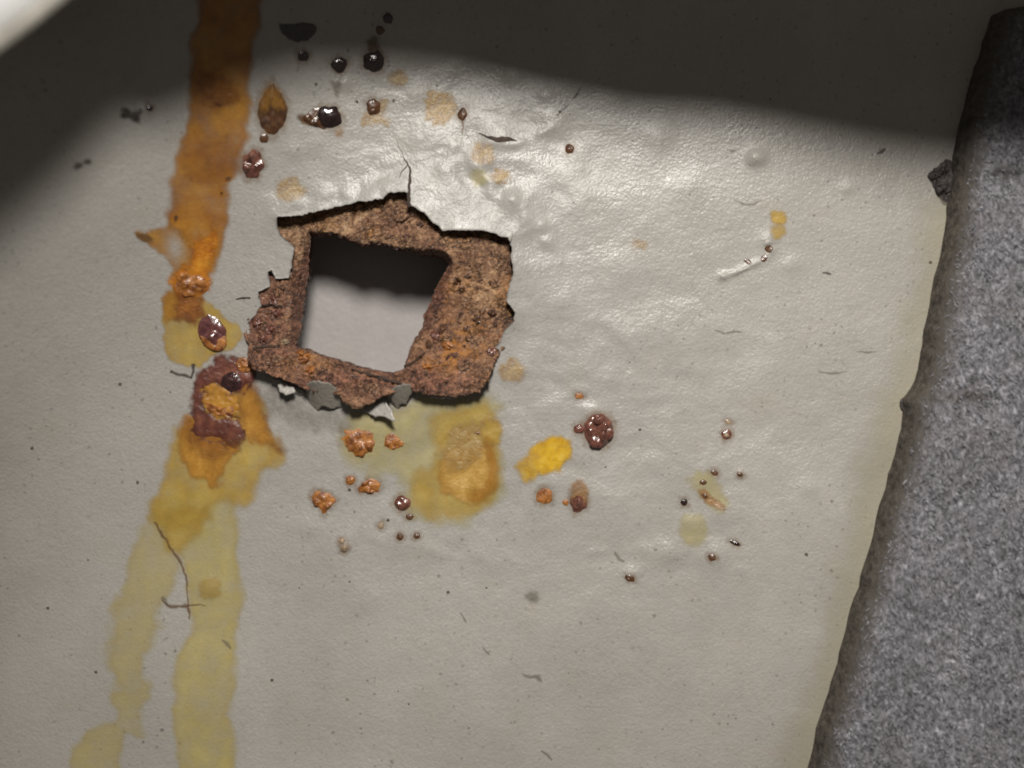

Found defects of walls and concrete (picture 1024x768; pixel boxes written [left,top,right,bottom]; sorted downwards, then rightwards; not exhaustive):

crack [397,141,411,207]
rust [771,211,786,238]
rust [136,0,523,768]
rust [518,414,614,481]
rust [695,473,726,510]